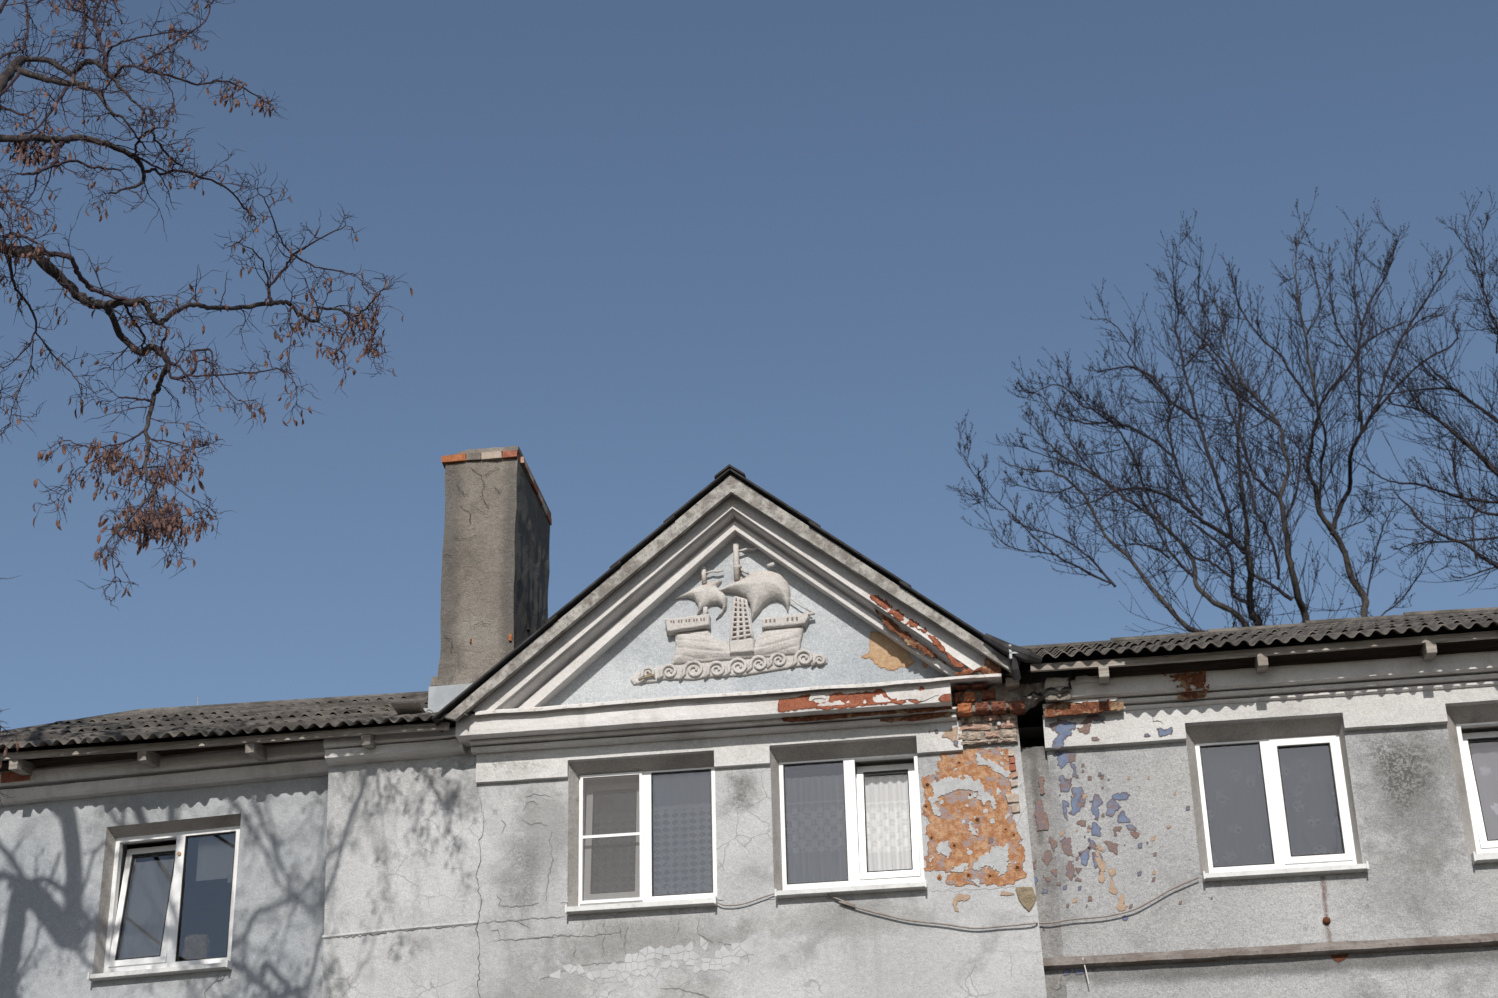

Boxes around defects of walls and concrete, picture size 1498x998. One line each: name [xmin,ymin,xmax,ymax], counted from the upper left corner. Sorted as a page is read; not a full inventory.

spalling [861,631,928,671]
peeling [1177,691,1208,701]
peeling [778,677,1173,921]
crack [324,791,754,998]
peeling [1063,968,1095,976]